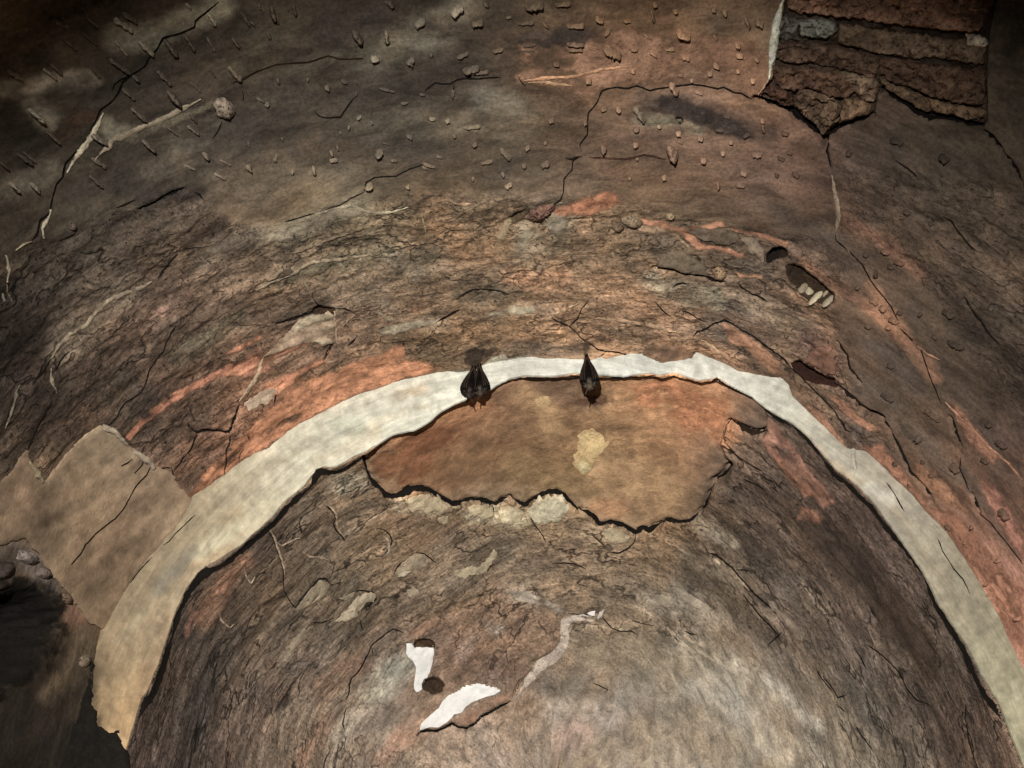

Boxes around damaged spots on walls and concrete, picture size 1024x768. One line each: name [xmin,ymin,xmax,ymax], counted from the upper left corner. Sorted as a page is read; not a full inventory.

crack [32,2,218,241]
flaking render [516,0,996,135]
crack [553,84,1022,205]
crack [943,216,977,252]
crack [835,234,1023,564]
flaking render [406,591,604,732]